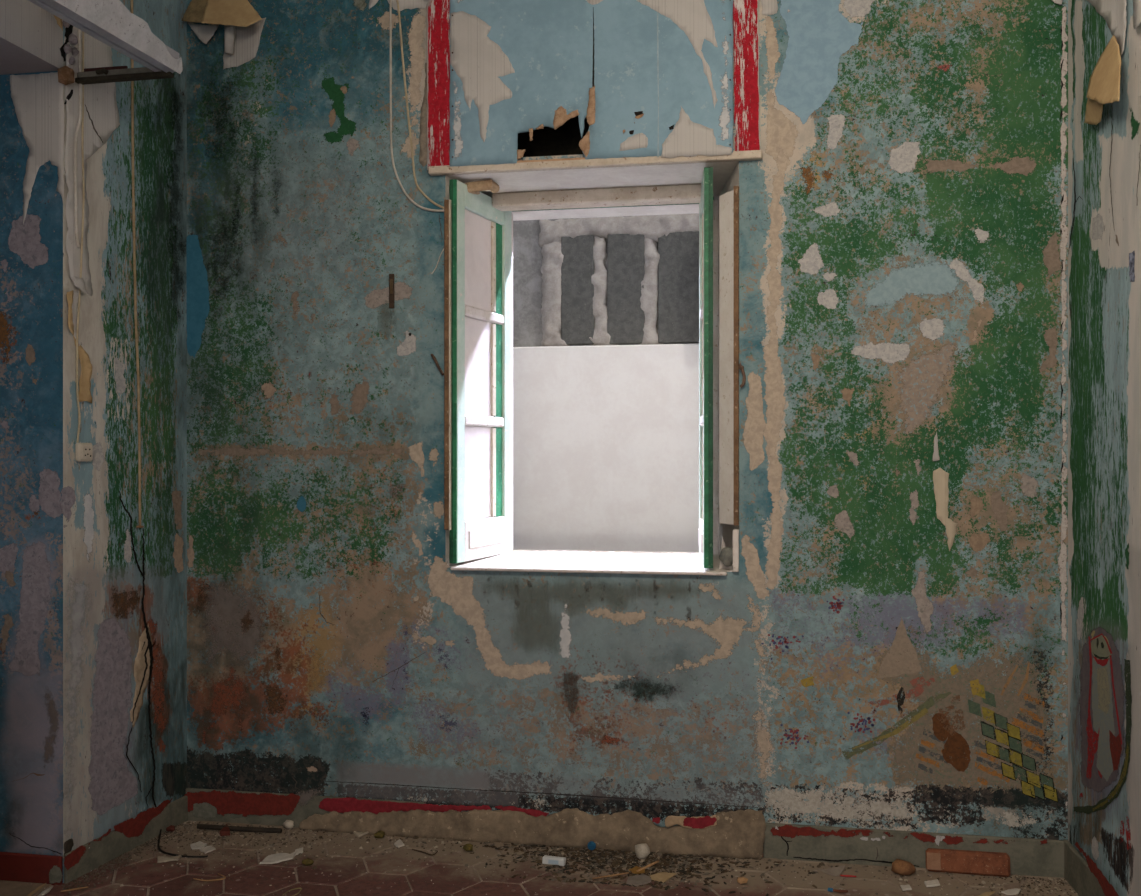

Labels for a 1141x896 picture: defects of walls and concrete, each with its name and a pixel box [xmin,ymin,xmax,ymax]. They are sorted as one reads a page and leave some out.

crack [119,491,157,807]
leakage [564,674,578,712]
leakage [616,679,672,700]
peeling [319,794,552,817]
peeling [652,815,717,829]